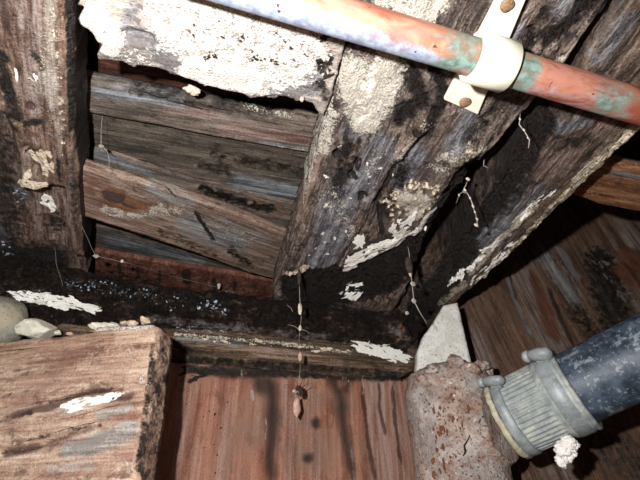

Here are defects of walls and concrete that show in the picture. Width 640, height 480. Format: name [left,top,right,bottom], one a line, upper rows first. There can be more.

water stain [126,3,155,49]
water stain [346,54,398,126]
water stain [380,178,444,221]
water stain [513,125,640,222]
peeling [343,207,437,272]
peeling [403,257,413,280]
water stain [447,216,543,287]
peeling [6,290,102,314]
peeling [283,343,333,361]
peeling [341,324,413,364]
water stain [204,370,389,478]
water stain [391,387,402,464]